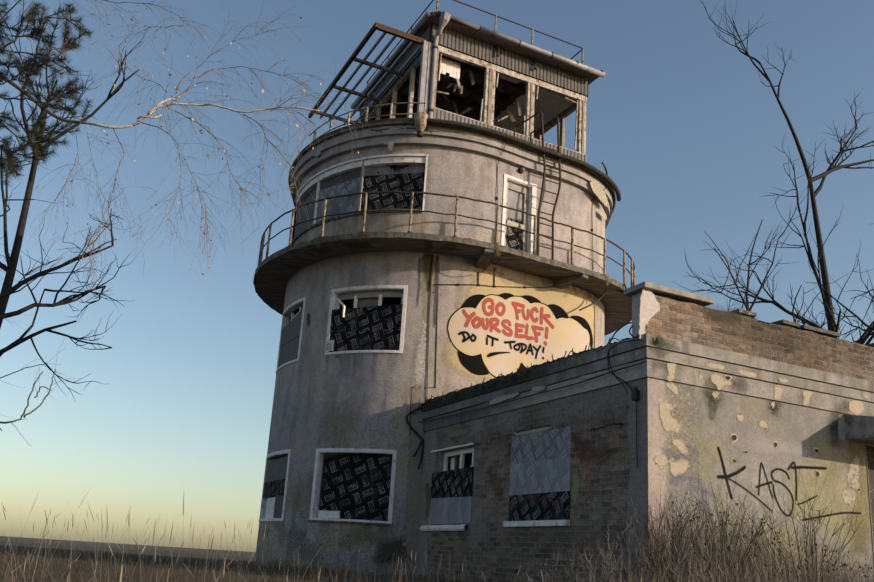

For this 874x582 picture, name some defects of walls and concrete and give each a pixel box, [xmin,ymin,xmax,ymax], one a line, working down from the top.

water stain [417,255,439,331]
flaking render [639,289,662,339]
peeling [654,363,690,477]
peeling [699,363,757,399]
peeling [770,377,788,408]
peeling [802,391,813,406]
peeling [838,393,869,441]
flaking render [842,455,861,506]